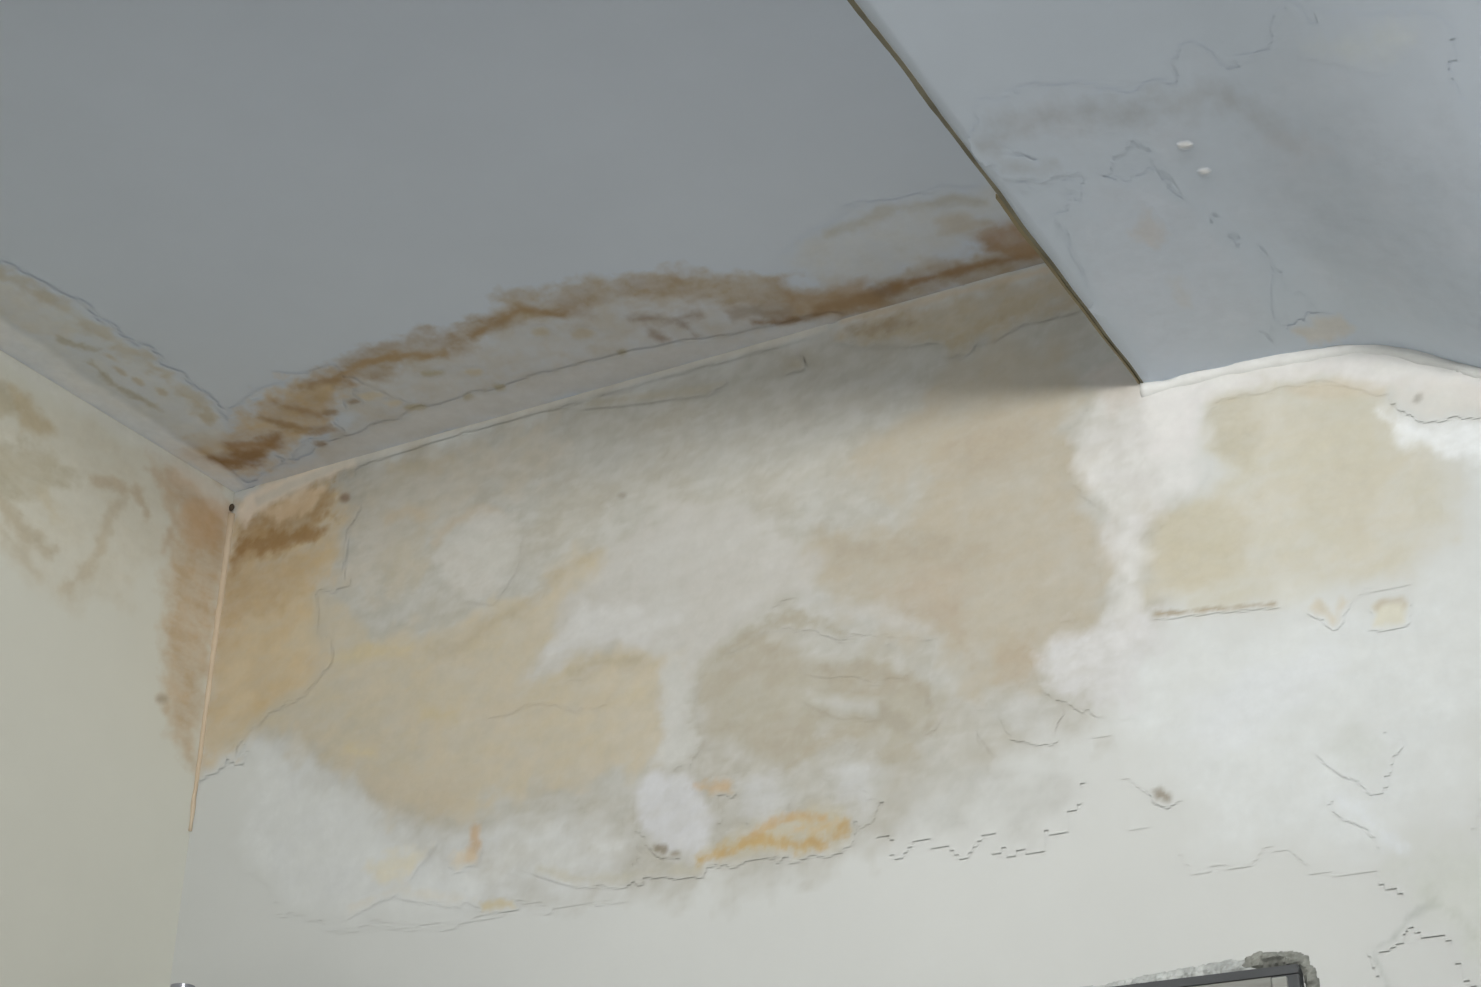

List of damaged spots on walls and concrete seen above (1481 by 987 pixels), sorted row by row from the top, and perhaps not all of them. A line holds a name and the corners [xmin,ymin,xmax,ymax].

water stain [0,262,241,461]
water stain [304,178,1045,442]
water stain [967,1,1481,382]
water stain [0,309,1118,834]
water stain [1146,379,1463,632]
water stain [343,802,894,925]